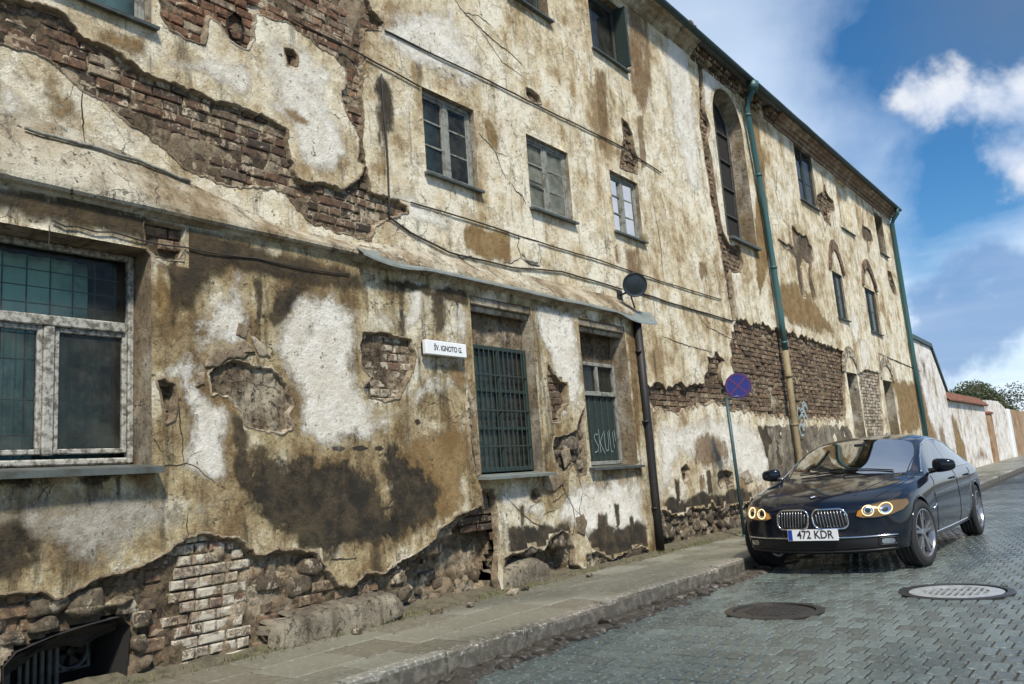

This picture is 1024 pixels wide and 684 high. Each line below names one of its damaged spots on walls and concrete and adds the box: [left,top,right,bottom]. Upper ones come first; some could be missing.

crack [455,0,522,76]
flaking render [0,0,409,248]
water stain [374,77,394,144]
flaking render [619,117,639,175]
flaking render [648,64,884,436]
crack [164,389,214,482]
flaking render [195,323,295,436]
flaking render [0,376,650,682]
water stain [233,414,467,560]
flaking render [358,330,417,403]
crack [504,480,591,544]
flaking render [529,360,587,504]